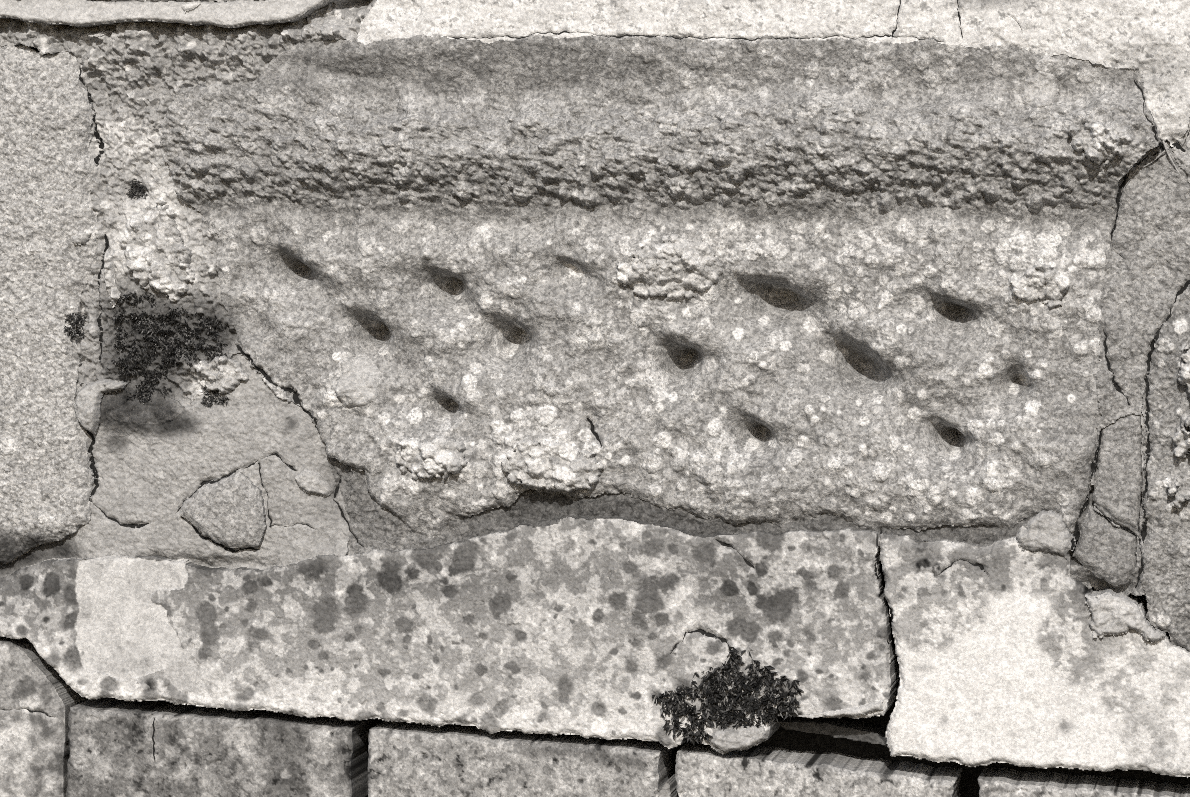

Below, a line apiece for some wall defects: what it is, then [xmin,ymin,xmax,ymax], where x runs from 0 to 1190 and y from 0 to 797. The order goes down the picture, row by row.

crack [1110,80,1190,258]
crack [80,423,149,528]
crack [176,453,314,553]
crack [234,342,364,547]
crack [874,529,896,650]
crack [1071,280,1190,588]